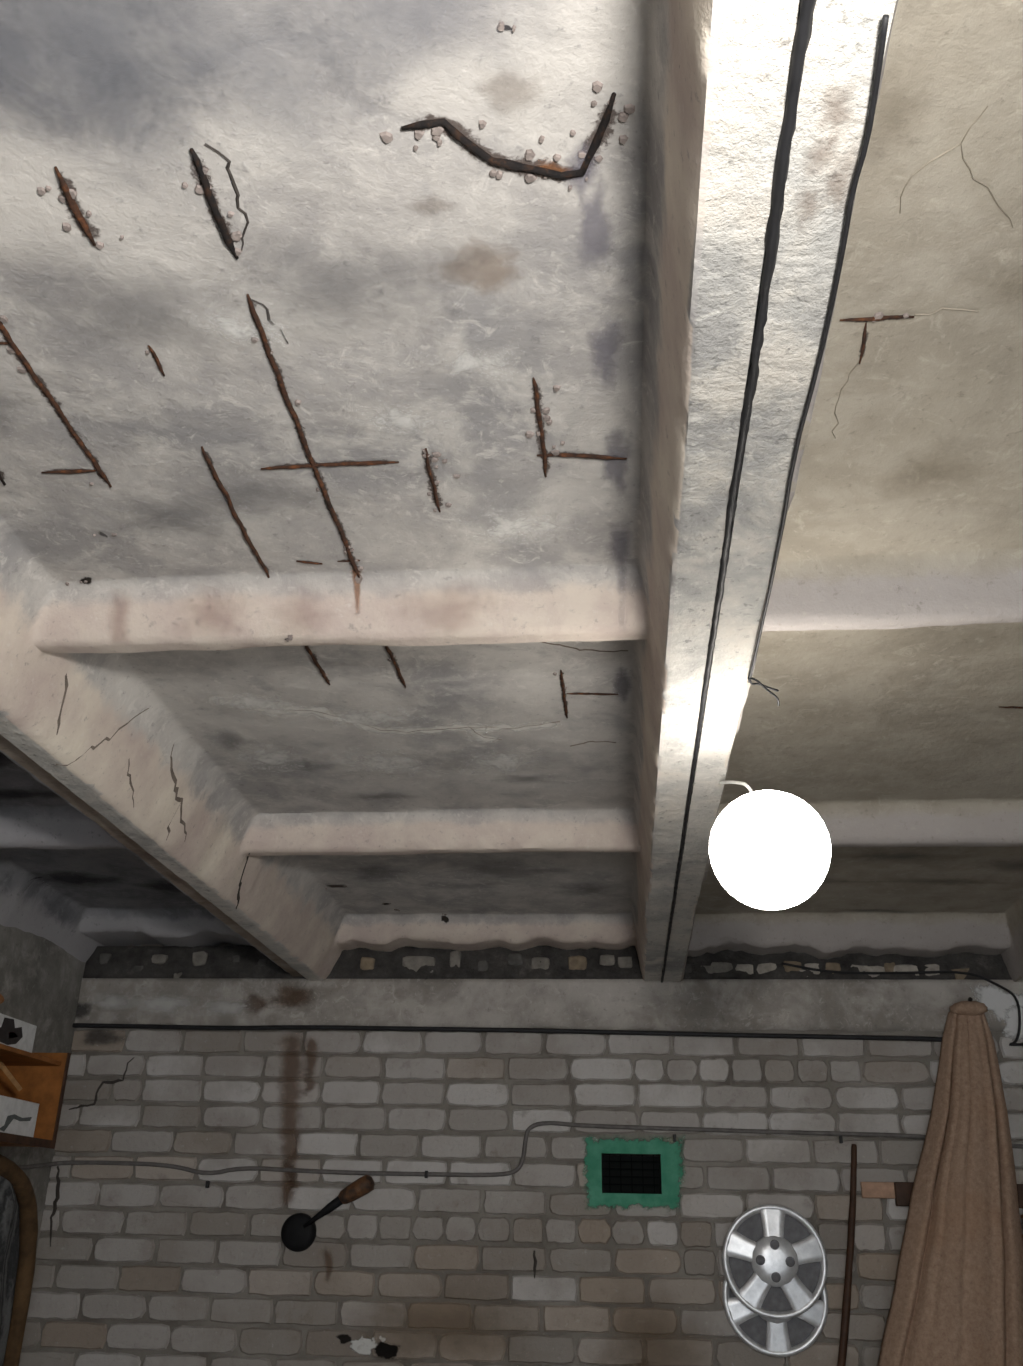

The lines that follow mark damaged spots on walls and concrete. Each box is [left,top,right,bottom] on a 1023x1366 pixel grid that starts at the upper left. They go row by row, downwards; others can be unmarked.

crack [900,106,1013,227]
crack [832,363,858,439]
crack [56,673,149,808]
crack [166,744,187,842]
rust [284,1037,315,1201]